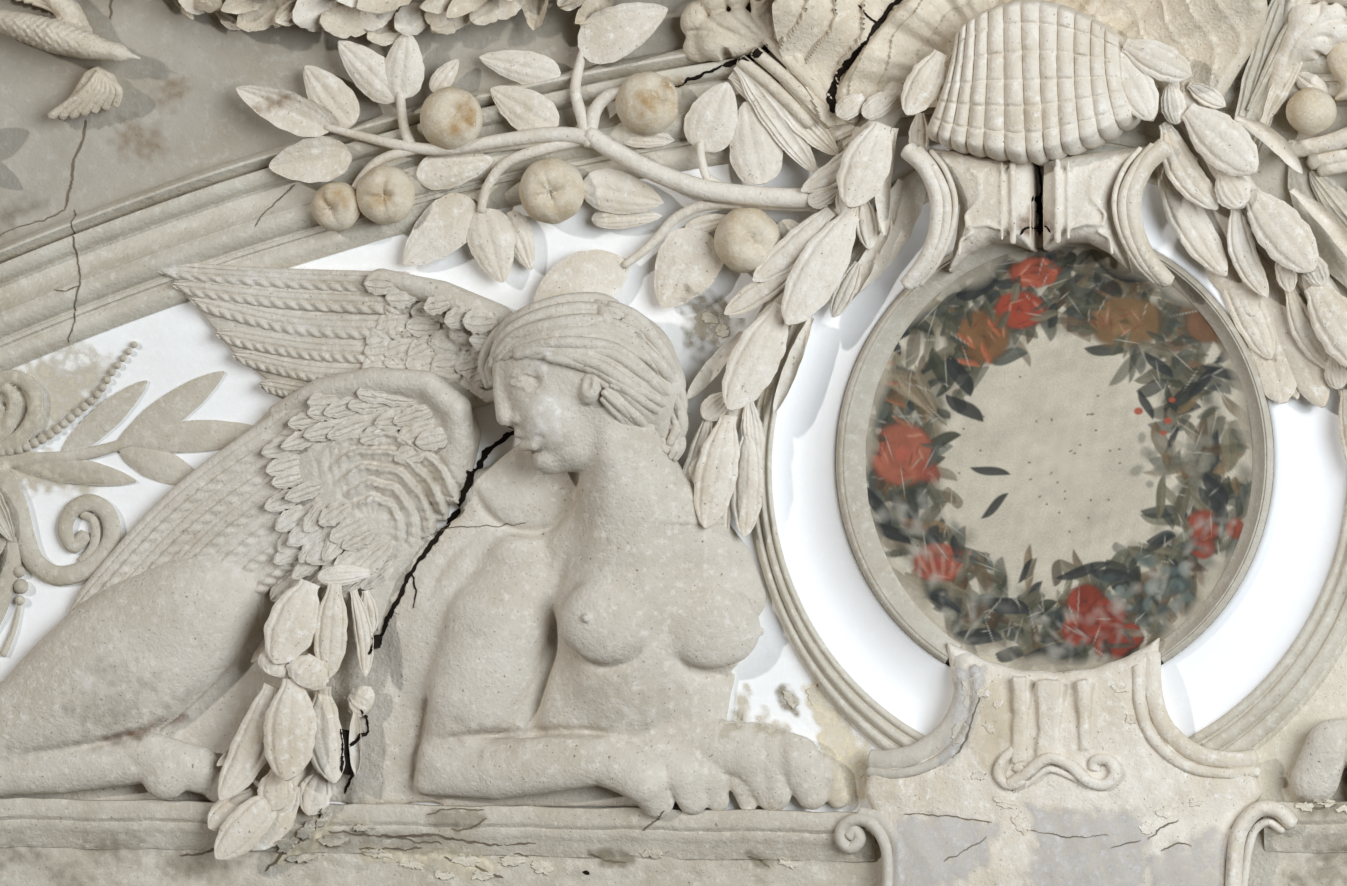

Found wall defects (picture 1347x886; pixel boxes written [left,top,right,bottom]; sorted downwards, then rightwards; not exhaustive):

crack [826,0,902,113]
crack [0,120,87,343]
crack [368,425,526,655]